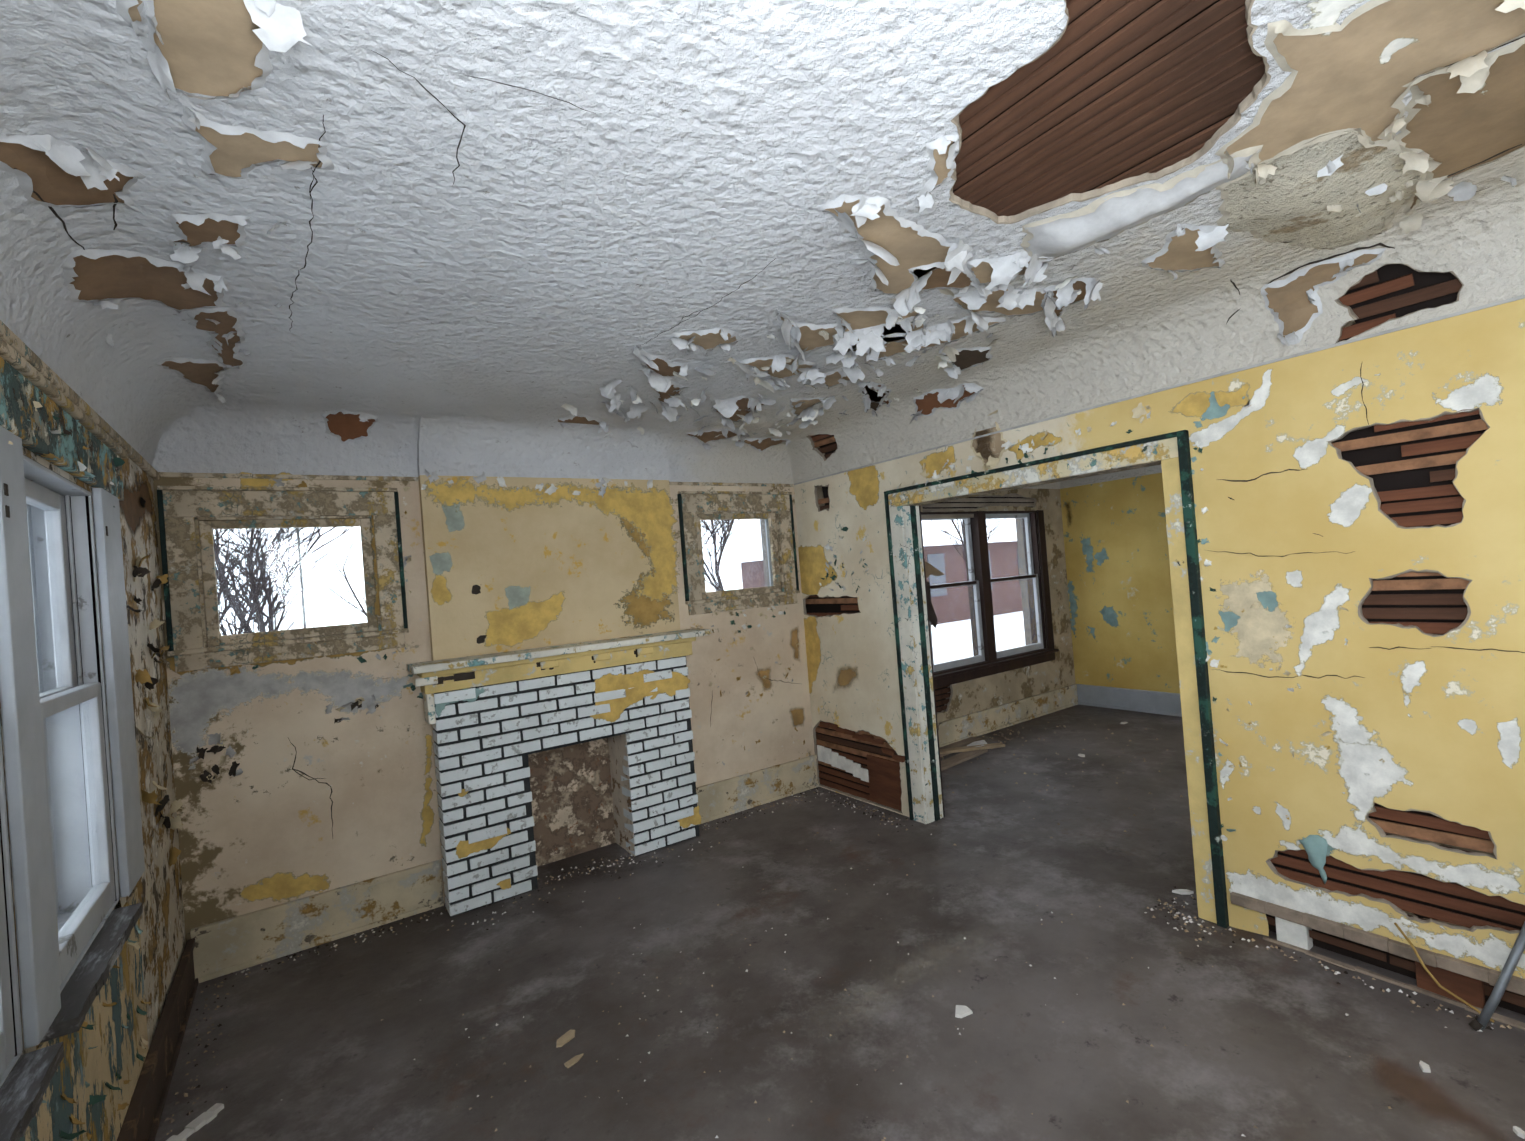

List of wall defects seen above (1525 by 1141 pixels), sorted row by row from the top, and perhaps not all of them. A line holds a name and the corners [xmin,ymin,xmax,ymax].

peeling [116,0,334,179]
peeling [0,133,146,208]
peeling [61,213,251,403]
crack [289,115,326,330]
flaking render [552,0,1525,475]
flaking render [1292,373,1504,529]
peeling [477,586,566,647]
peeling [403,469,680,629]
flaking render [1197,538,1472,692]
flaking render [794,720,905,814]
peeling [1218,739,1242,801]
peeling [1226,695,1525,1030]